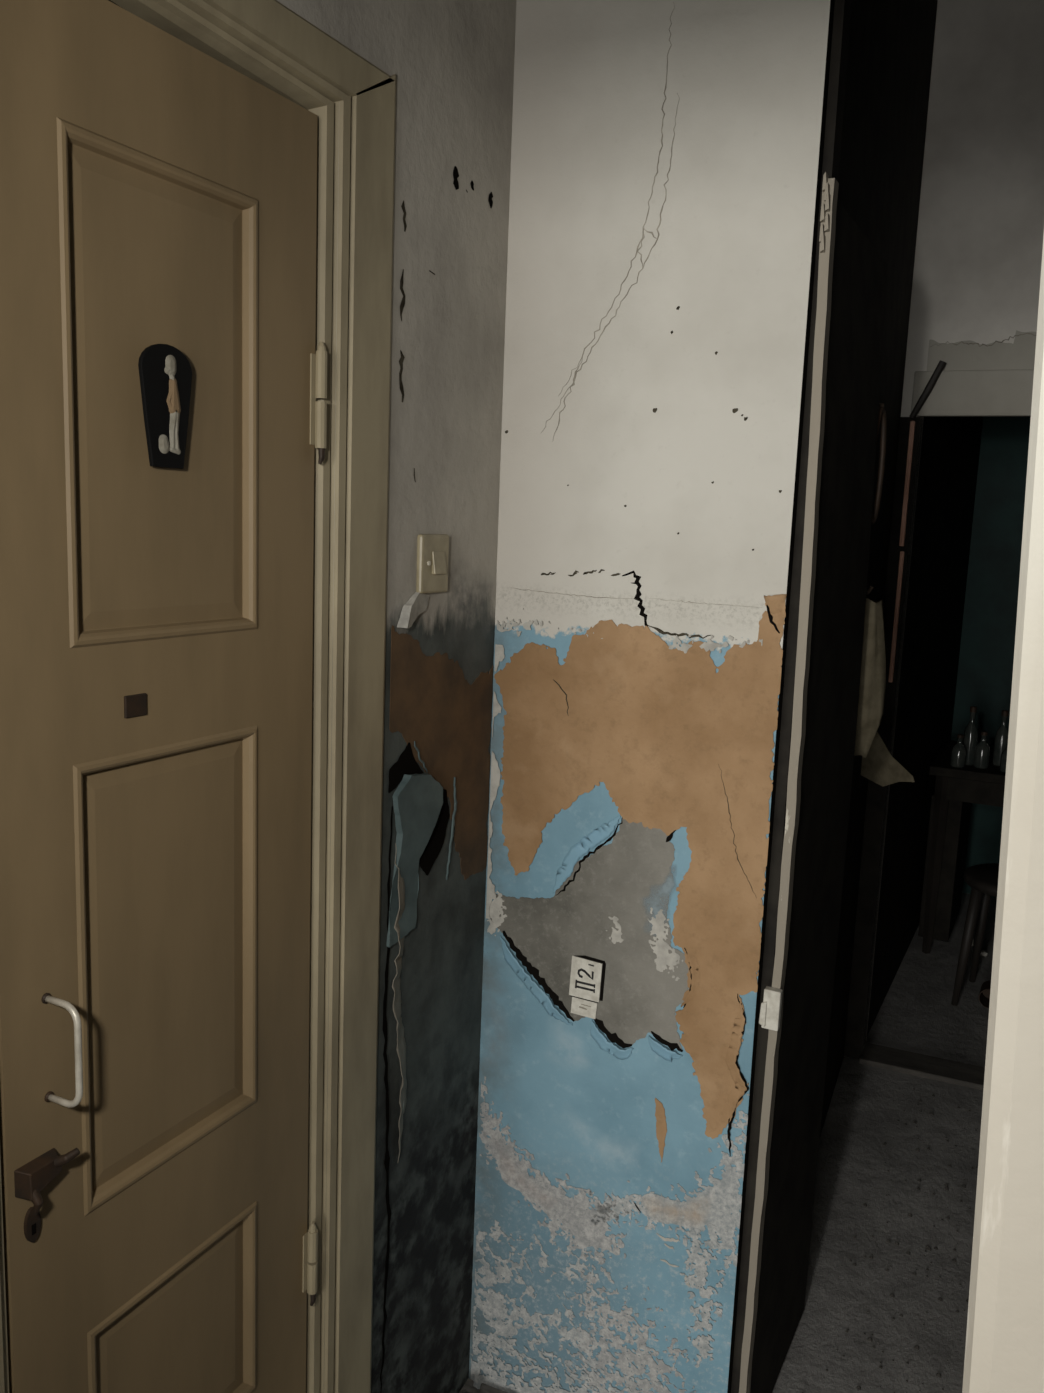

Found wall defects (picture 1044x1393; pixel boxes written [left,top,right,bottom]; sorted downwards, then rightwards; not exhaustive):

crack [541,2,680,438]
crack [515,571,758,639]
peeling [380,592,787,1393]